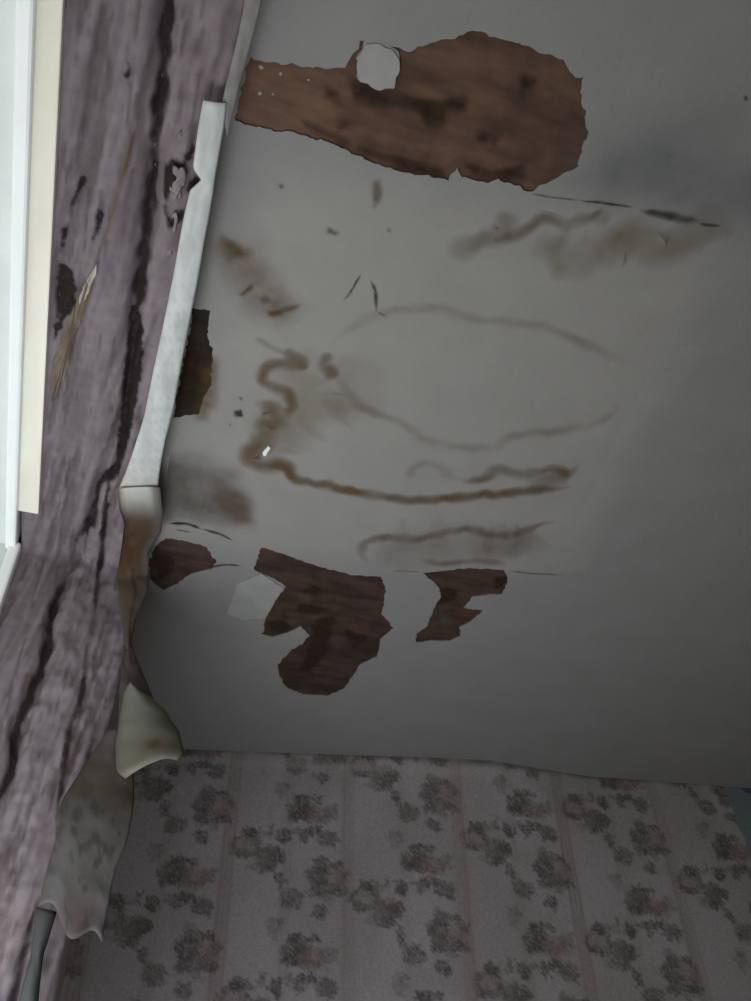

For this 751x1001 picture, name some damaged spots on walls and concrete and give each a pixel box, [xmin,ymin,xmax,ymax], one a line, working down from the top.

peeling [235,31,588,191]
peeling [174,308,213,417]
leakage [245,442,365,495]
leakage [386,479,546,502]
peeling [149,538,216,589]
peeling [227,548,393,695]
peeling [416,568,507,642]